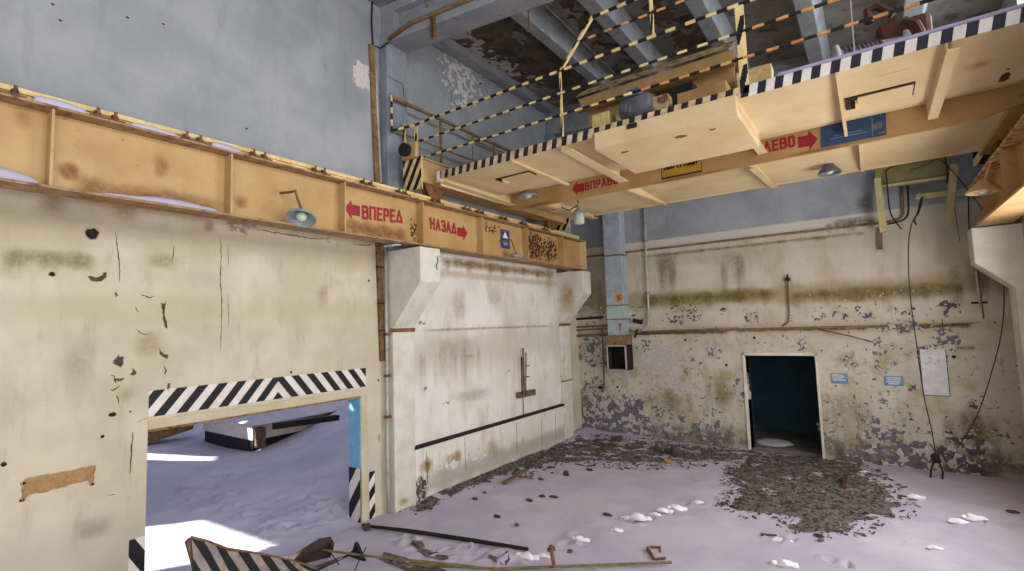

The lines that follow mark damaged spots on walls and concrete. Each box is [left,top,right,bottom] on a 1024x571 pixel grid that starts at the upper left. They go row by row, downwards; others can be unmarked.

peeling [352,60,370,93]
peeling [436,53,513,118]
corrosion [447,230,558,276]
crack [115,234,154,335]
crack [219,235,229,348]
water stain [649,291,766,304]
water stain [802,285,948,299]
peeling [578,289,1024,476]
flaking render [19,465,96,502]